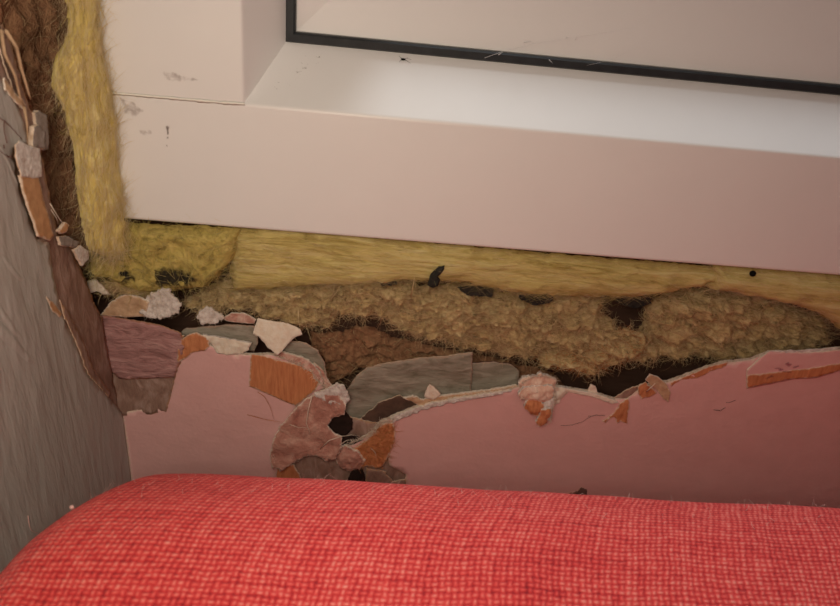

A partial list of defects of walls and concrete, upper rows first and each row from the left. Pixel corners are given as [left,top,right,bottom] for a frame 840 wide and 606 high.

peeling [253,318,302,355]
peeling [746,347,840,389]
peeling [424,383,441,400]
spalling [602,384,640,424]